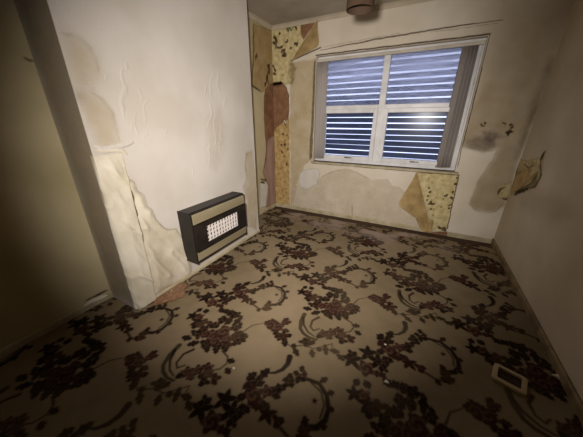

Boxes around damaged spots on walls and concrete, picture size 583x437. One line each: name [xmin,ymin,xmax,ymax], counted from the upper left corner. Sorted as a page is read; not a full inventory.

peeling [252,20,321,208]
peeling [399,172,460,233]
peeling [498,151,546,200]